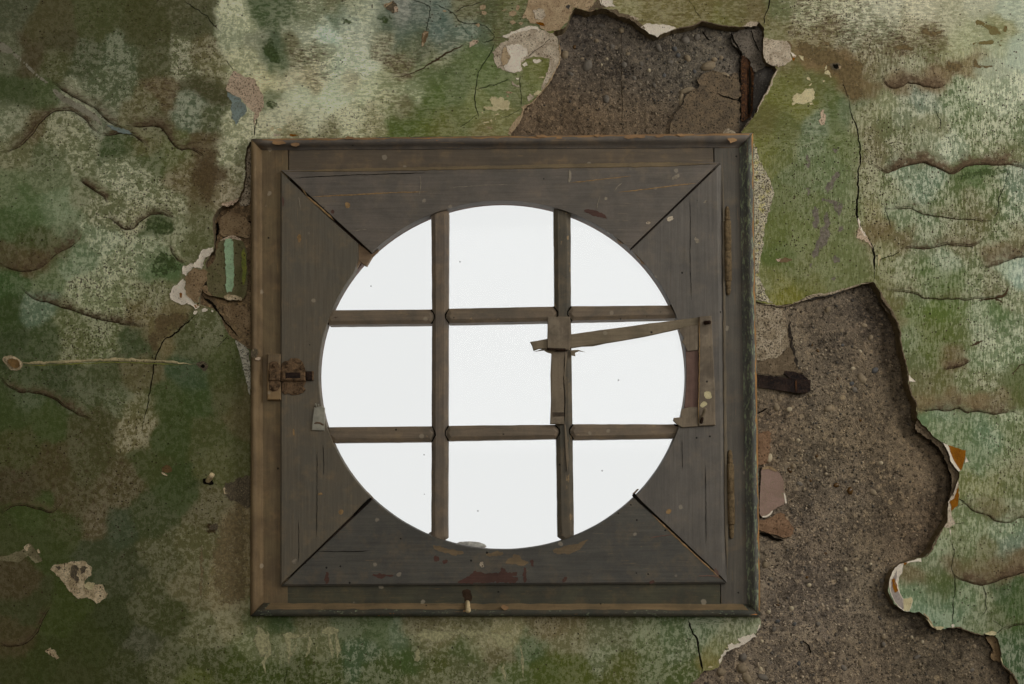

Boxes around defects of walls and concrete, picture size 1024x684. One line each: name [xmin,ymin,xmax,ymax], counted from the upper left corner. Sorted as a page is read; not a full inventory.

peeling [226,71,264,124]
crack [388,0,522,127]
flaking render [481,0,804,143]
corrosion [739,54,754,122]
leakage [946,59,992,72]
leakage [145,216,176,235]
leakage [151,251,180,277]
flaking render [170,146,261,394]
crack [843,84,900,279]
crack [142,315,195,430]
flaking render [690,144,1018,684]
peeling [0,543,108,604]